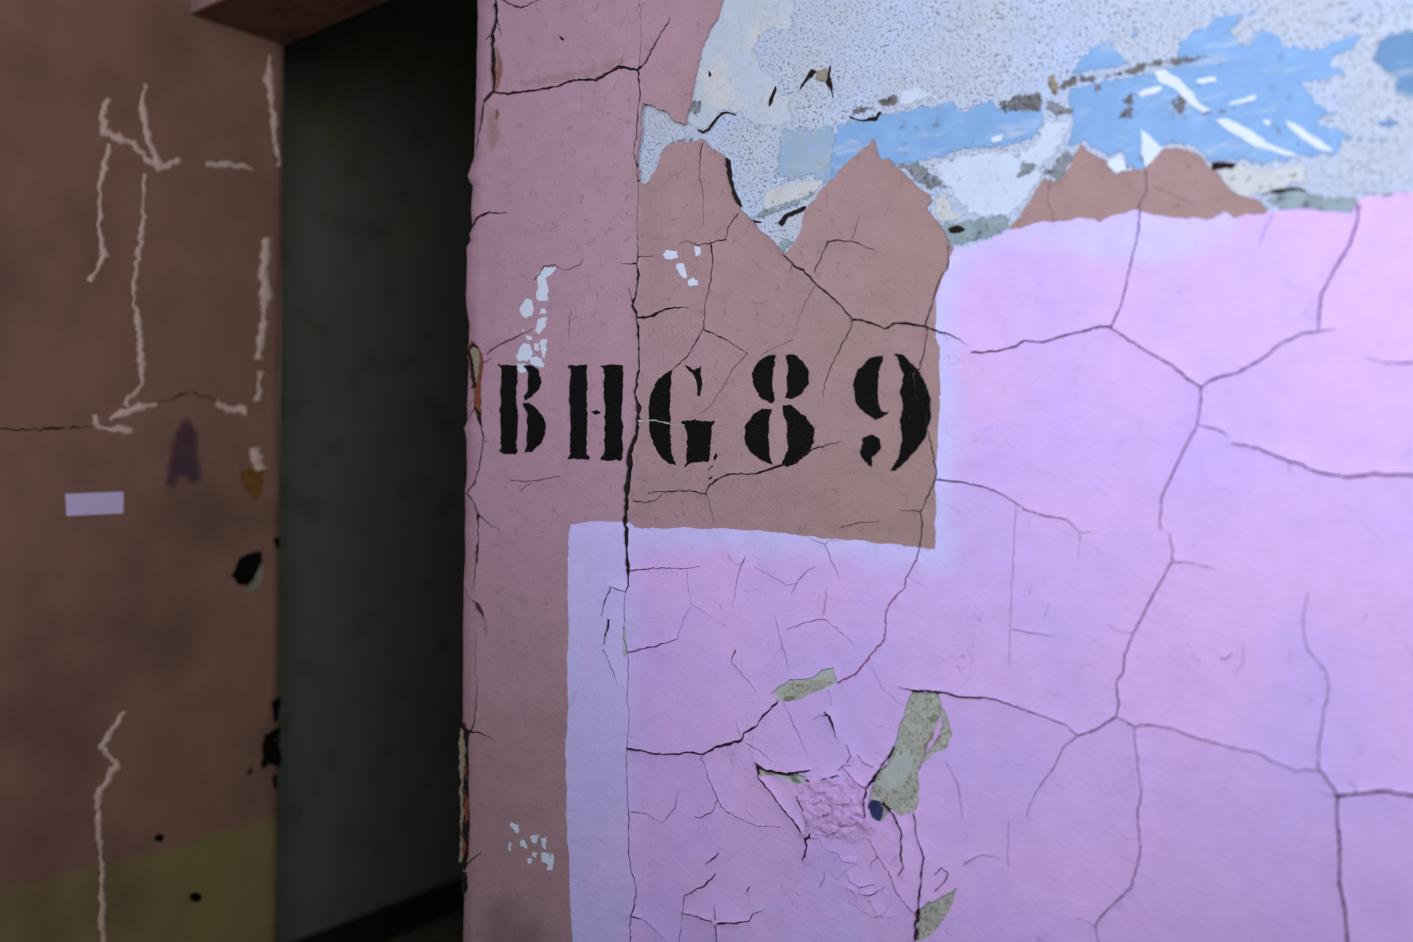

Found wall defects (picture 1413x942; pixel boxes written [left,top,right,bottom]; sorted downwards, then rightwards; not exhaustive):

peeling [638,0,1413,256]
crack [0,425,91,433]
crack [467,0,1413,942]
spalling [231,537,280,591]
spalling [772,668,837,702]
spalling [868,692,952,864]
spalling [915,888,957,942]